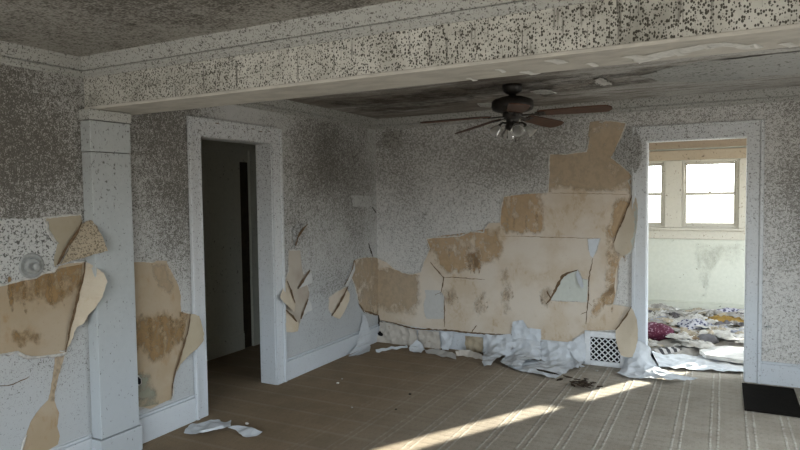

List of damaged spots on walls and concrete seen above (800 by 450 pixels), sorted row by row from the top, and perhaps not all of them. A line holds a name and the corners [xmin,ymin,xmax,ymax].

leakage [8,264,82,311]
peeling [0,213,108,450]
leakage [136,312,186,362]
peeling [134,260,204,410]
peeling [280,223,313,333]
peeling [328,260,355,319]
peeling [377,119,642,357]